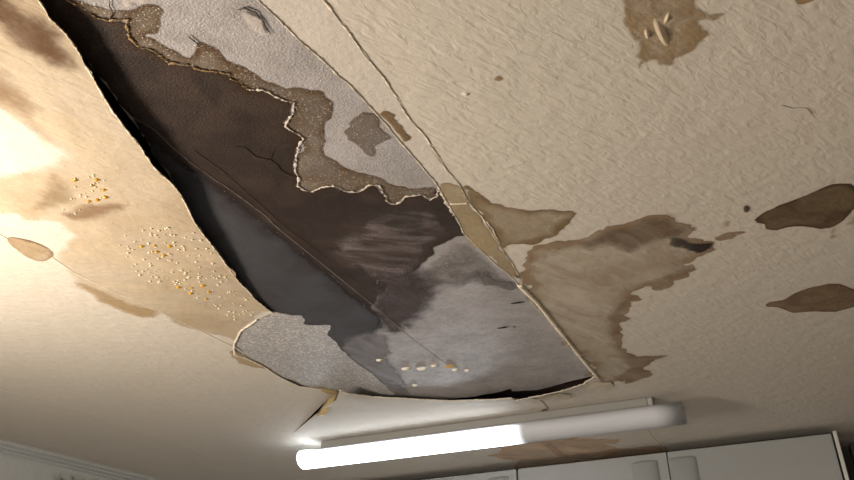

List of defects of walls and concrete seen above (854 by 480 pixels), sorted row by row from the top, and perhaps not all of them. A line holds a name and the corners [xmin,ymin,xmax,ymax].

peeling [38,0,613,435]
damp [0,0,745,394]
damp [744,184,854,230]
damp [766,284,854,313]